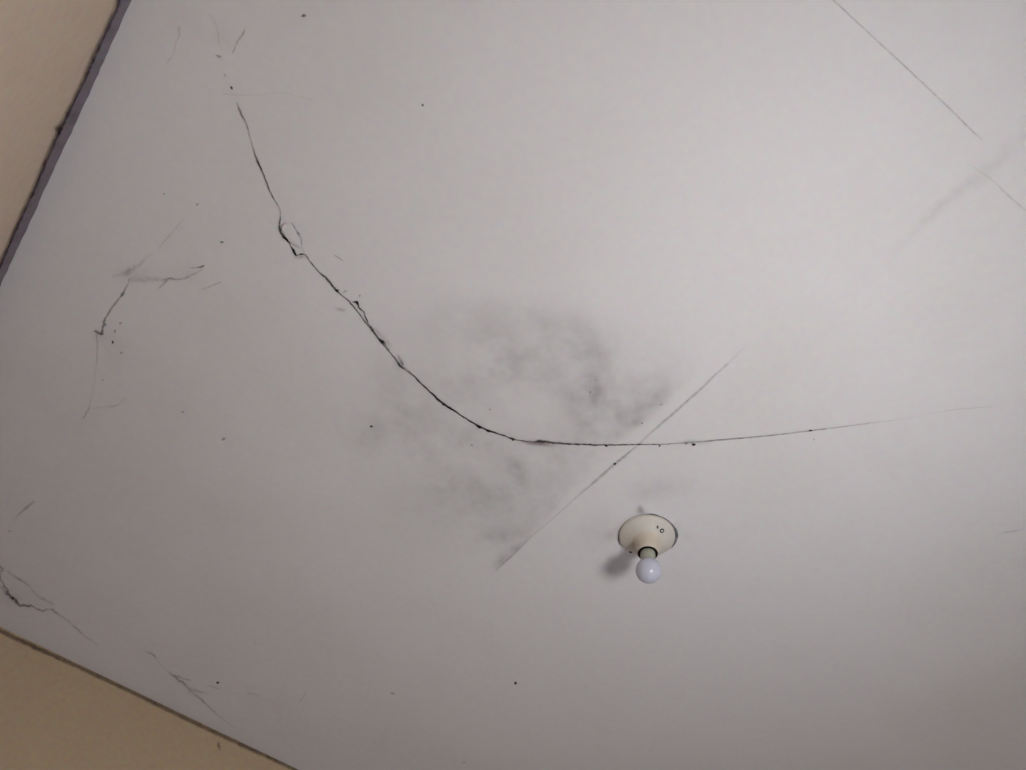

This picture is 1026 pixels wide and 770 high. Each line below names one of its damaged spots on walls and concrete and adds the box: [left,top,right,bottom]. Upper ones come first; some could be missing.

crack [0,0,120,267]
crack [254,151,737,551]